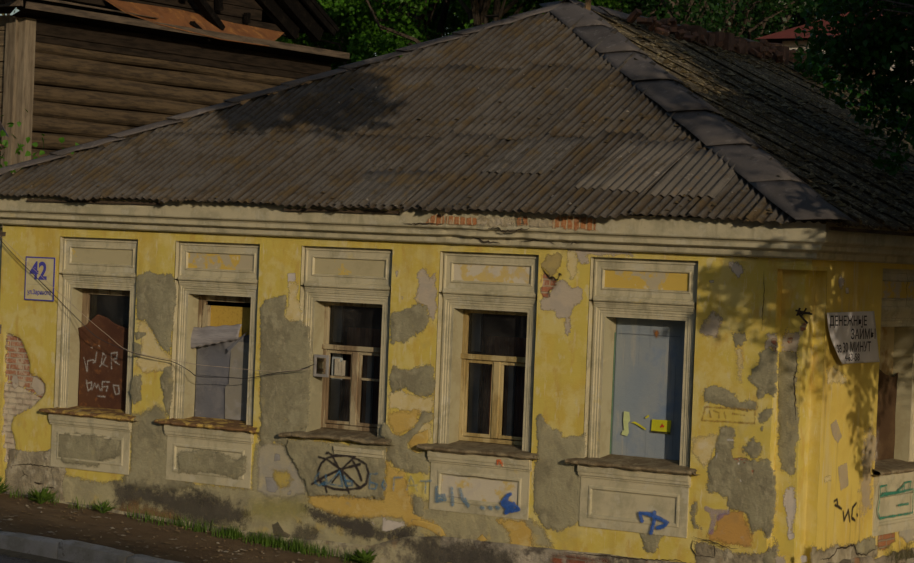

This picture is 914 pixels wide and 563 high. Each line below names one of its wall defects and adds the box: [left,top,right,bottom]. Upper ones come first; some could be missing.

flaking render [426,214,596,232]
peeling [284,273,303,322]
peeling [540,249,634,335]
peeling [134,321,173,373]
peeling [764,323,807,352]
flaking render [1,333,66,501]
crack [568,536,737,563]